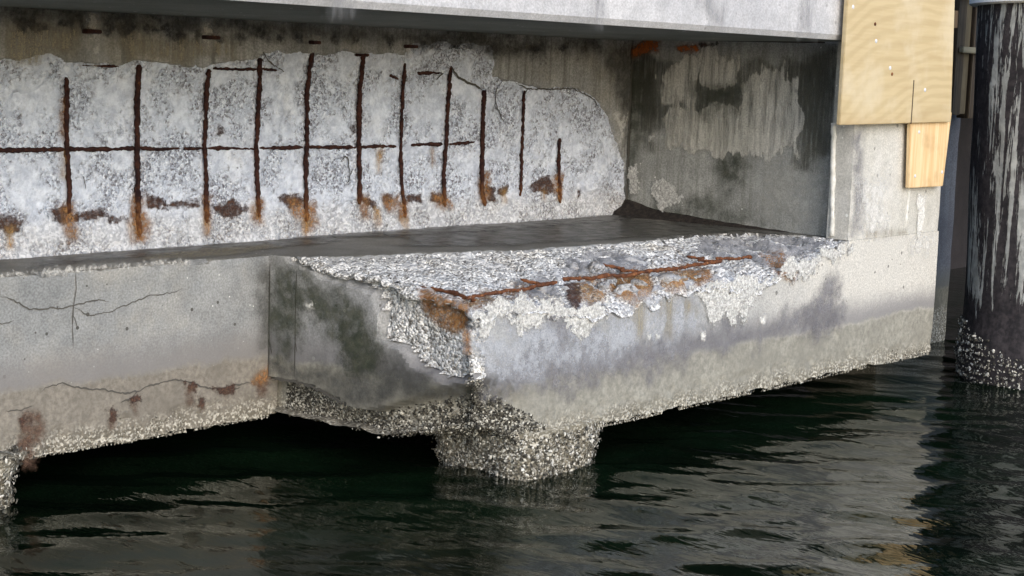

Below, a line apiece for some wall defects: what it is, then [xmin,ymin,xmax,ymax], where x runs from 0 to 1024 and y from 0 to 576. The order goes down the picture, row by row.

spalling [0,41,684,275]
leakage [605,47,836,221]
corrosion [0,213,23,247]
corrosion [51,194,264,241]
corrosion [279,193,319,234]
corrosion [360,192,453,223]
corrosion [479,172,509,202]
corrosion [528,174,564,199]
spalling [291,233,842,381]
corrosion [564,267,711,332]
crack [0,269,345,412]
leakage [273,353,432,408]